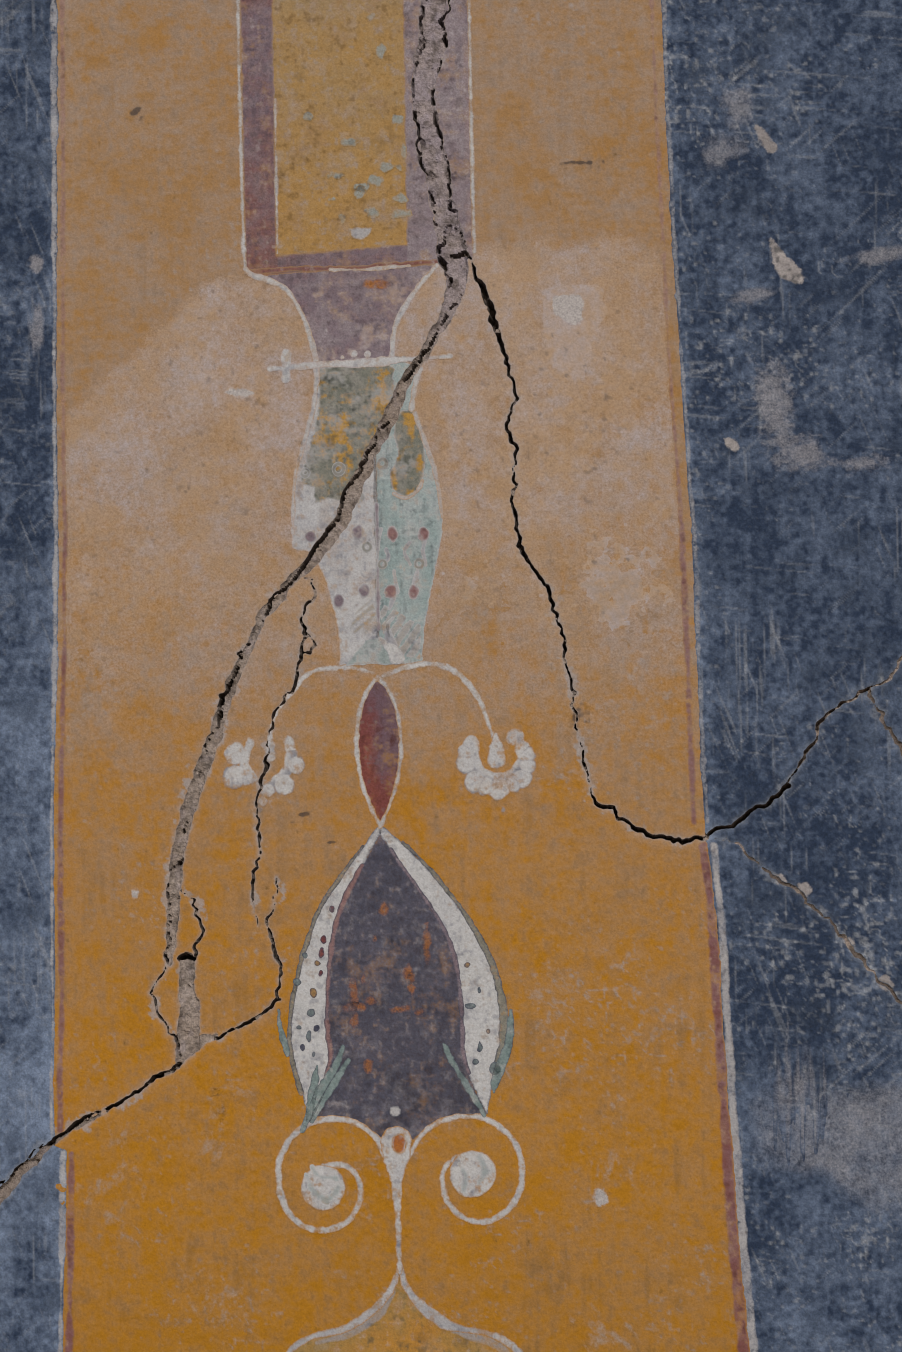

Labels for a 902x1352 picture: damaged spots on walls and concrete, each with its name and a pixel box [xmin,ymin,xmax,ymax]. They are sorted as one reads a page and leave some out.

crack [0,0,578,1205]
crack [580,656,902,1004]